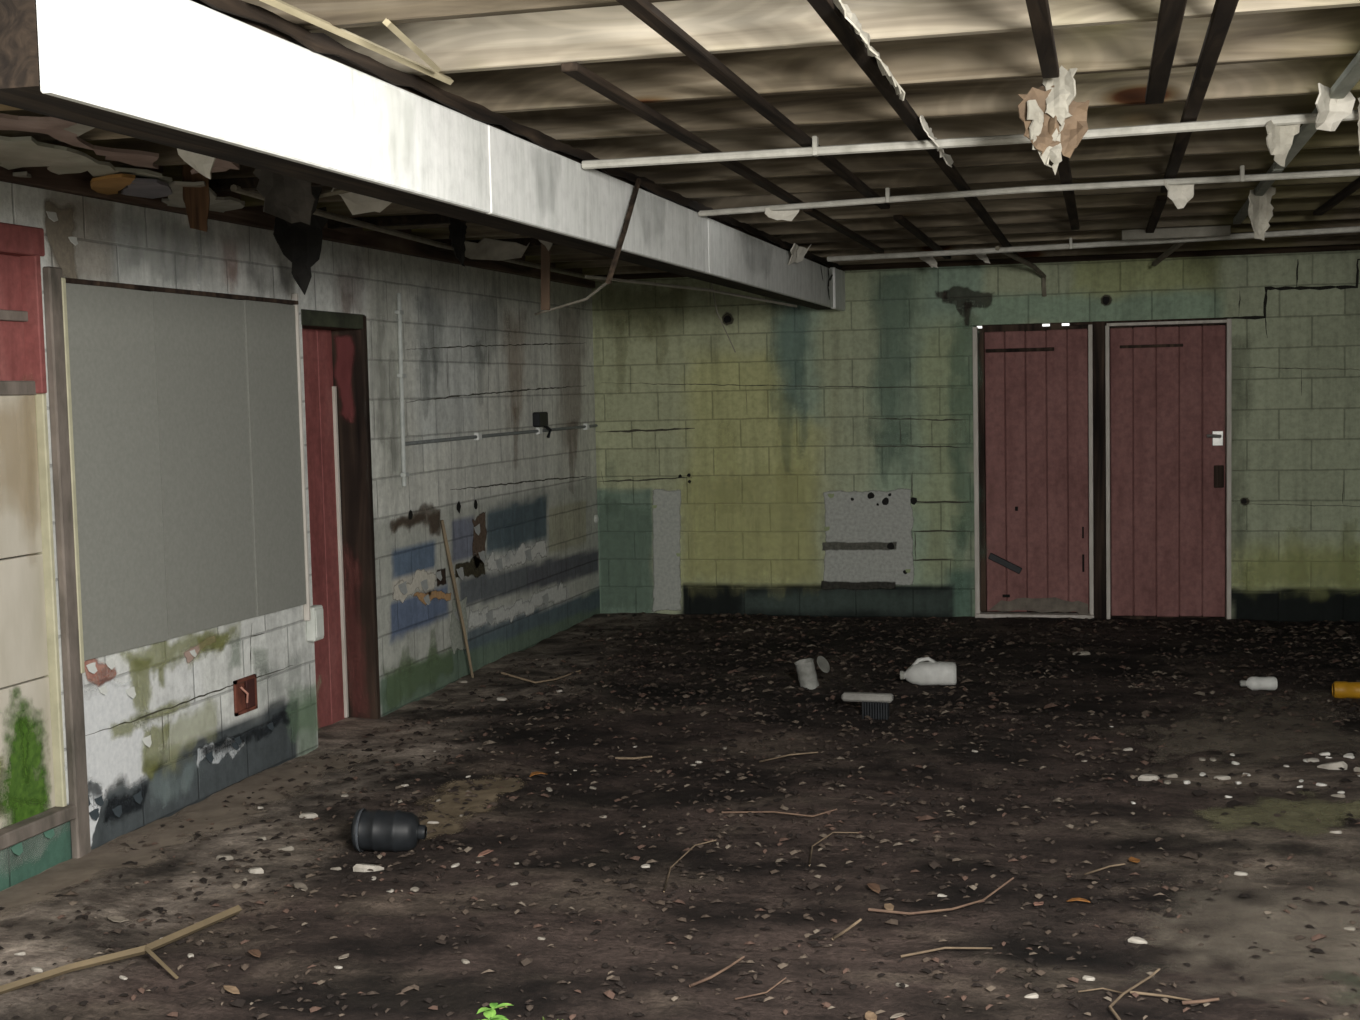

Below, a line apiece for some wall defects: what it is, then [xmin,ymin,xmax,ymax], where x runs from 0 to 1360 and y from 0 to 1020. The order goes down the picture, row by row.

peeling [45,200,78,279]
crack [1210,259,1360,395]
peeling [391,500,566,654]
flaking render [83,658,152,845]
peeling [197,710,289,766]